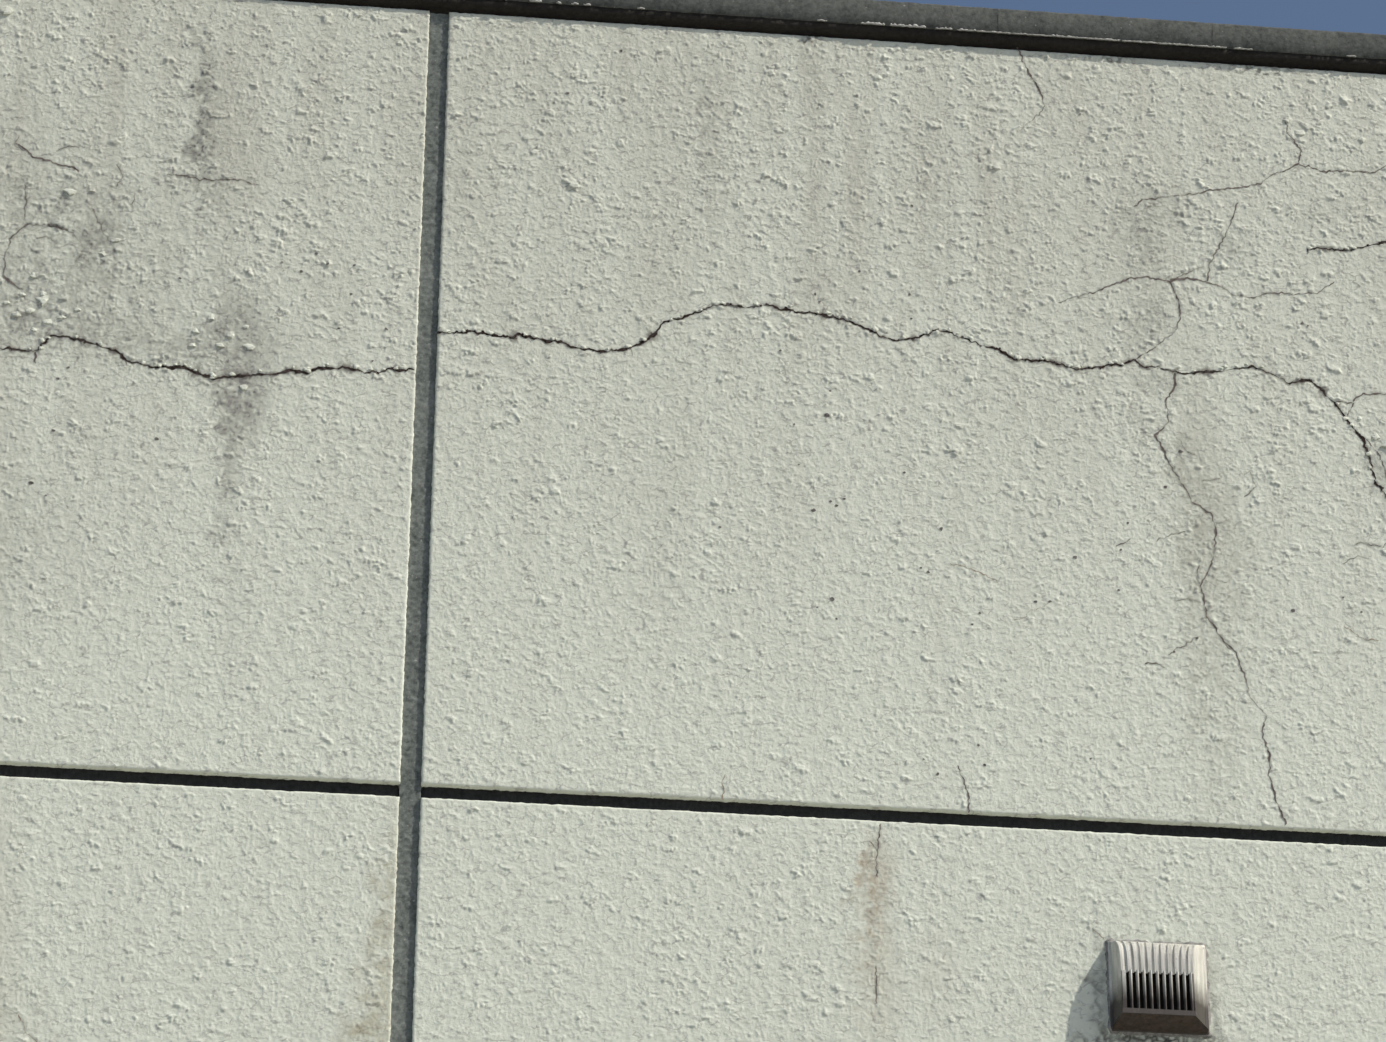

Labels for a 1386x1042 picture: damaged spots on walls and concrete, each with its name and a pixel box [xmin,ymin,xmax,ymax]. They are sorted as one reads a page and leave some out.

crack [997,19,1045,131]
crack [3,137,109,299]
crack [169,174,258,185]
crack [0,335,414,380]
crack [437,118,1386,825]